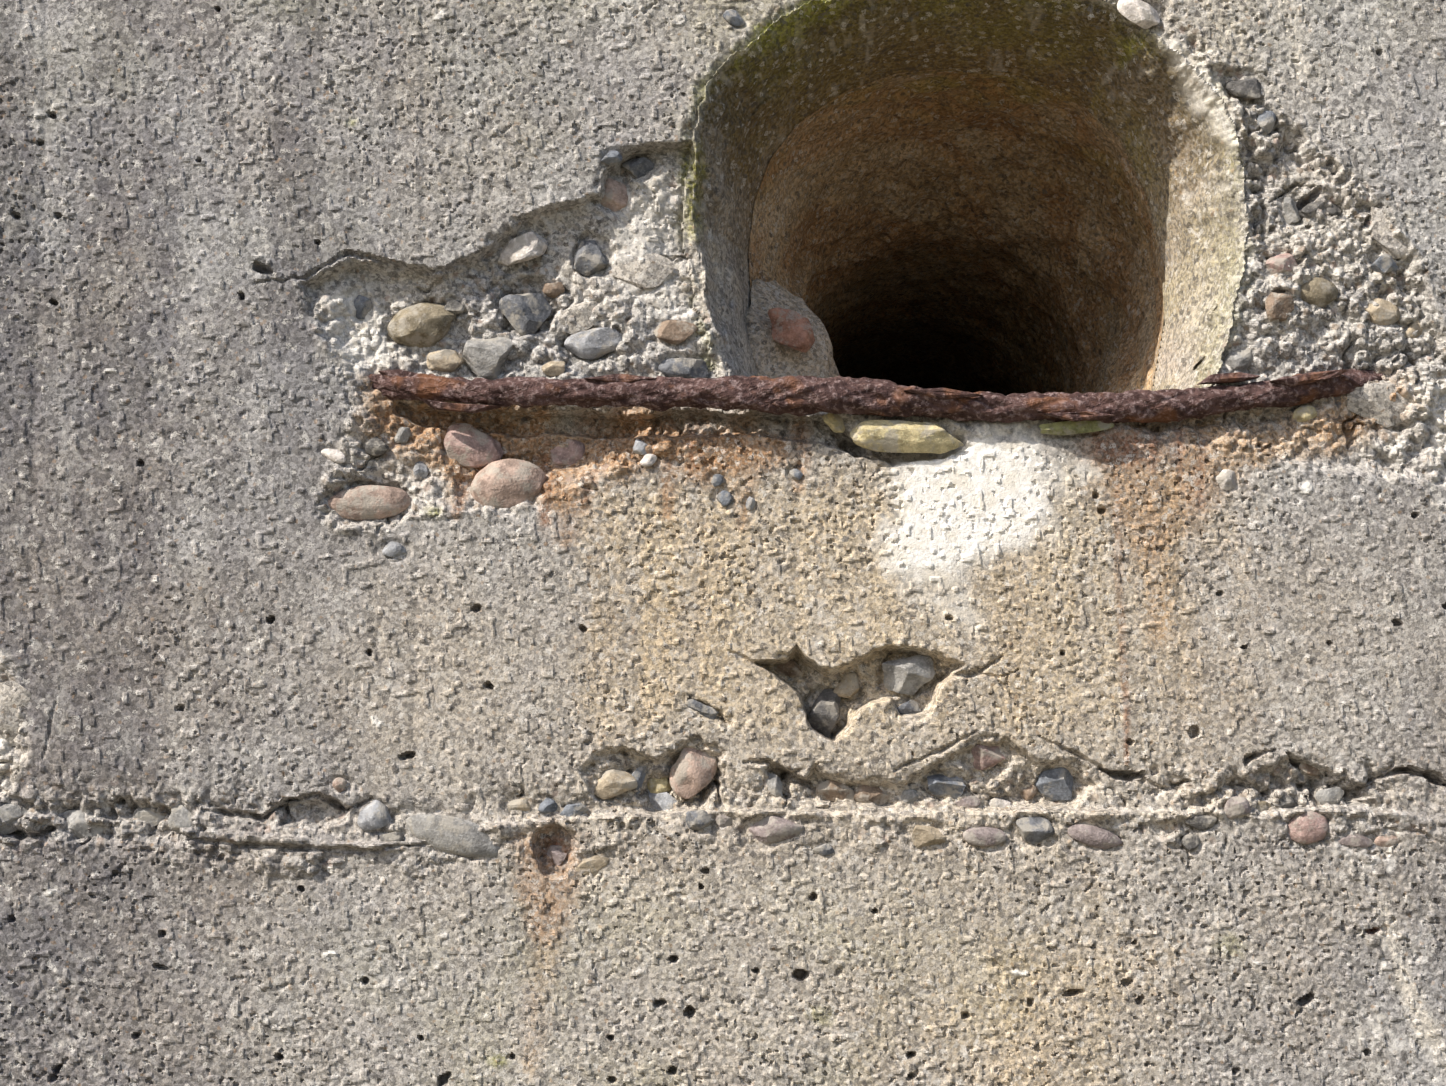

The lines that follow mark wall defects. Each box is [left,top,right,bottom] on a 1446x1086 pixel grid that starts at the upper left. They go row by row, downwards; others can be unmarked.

crack [254,250,470,286]
spalling [1142,0,1446,490]
spalling [298,139,718,537]
spalling [659,407,821,438]
damp [912,417,984,437]
corrosion [359,369,1431,765]
damp [558,424,1254,803]
crack [41,702,60,761]
crack [688,697,734,726]
crack [0,731,1446,873]
spalling [758,642,970,744]
spalling [759,736,1099,812]